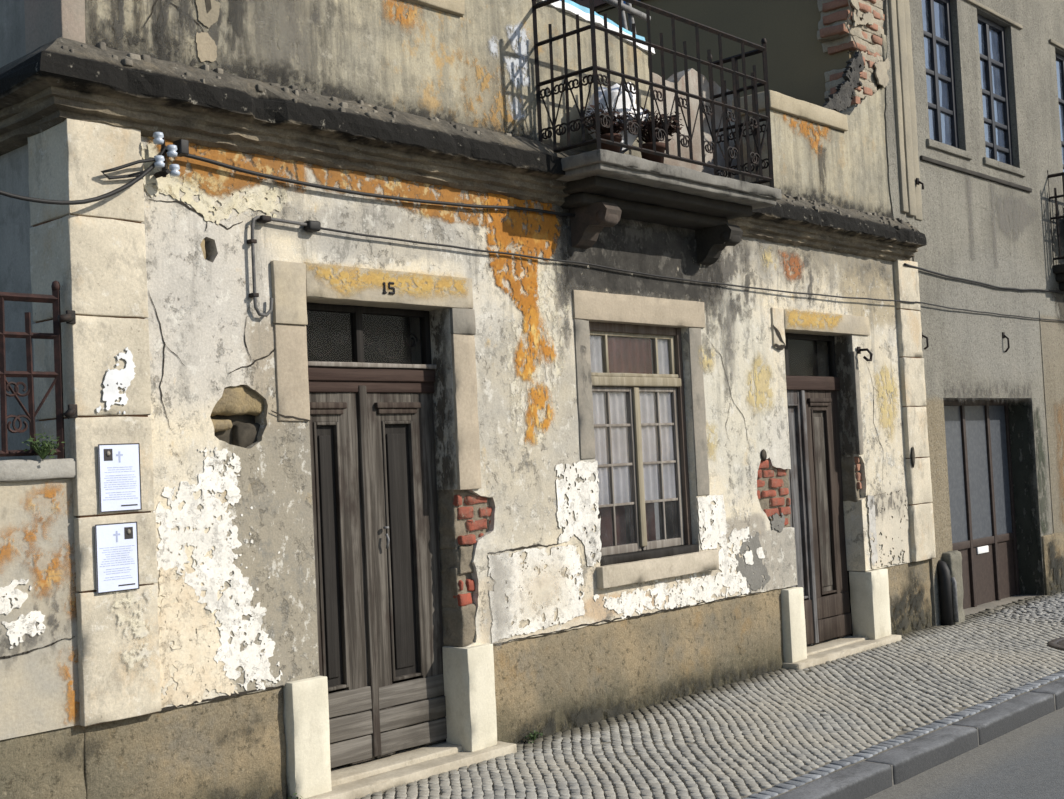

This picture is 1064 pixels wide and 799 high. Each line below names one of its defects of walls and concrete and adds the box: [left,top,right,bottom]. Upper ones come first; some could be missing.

water stain [90,0,363,101]
flaking render [817,0,890,107]
water stain [378,102,456,123]
peeling [141,137,288,225]
peeling [96,347,136,414]
crack [149,294,185,427]
peeling [0,579,46,649]
peeling [153,385,283,708]
flaking render [437,489,493,550]
peeling [593,527,771,619]
flaking render [757,449,791,532]
water stain [945,385,1064,595]